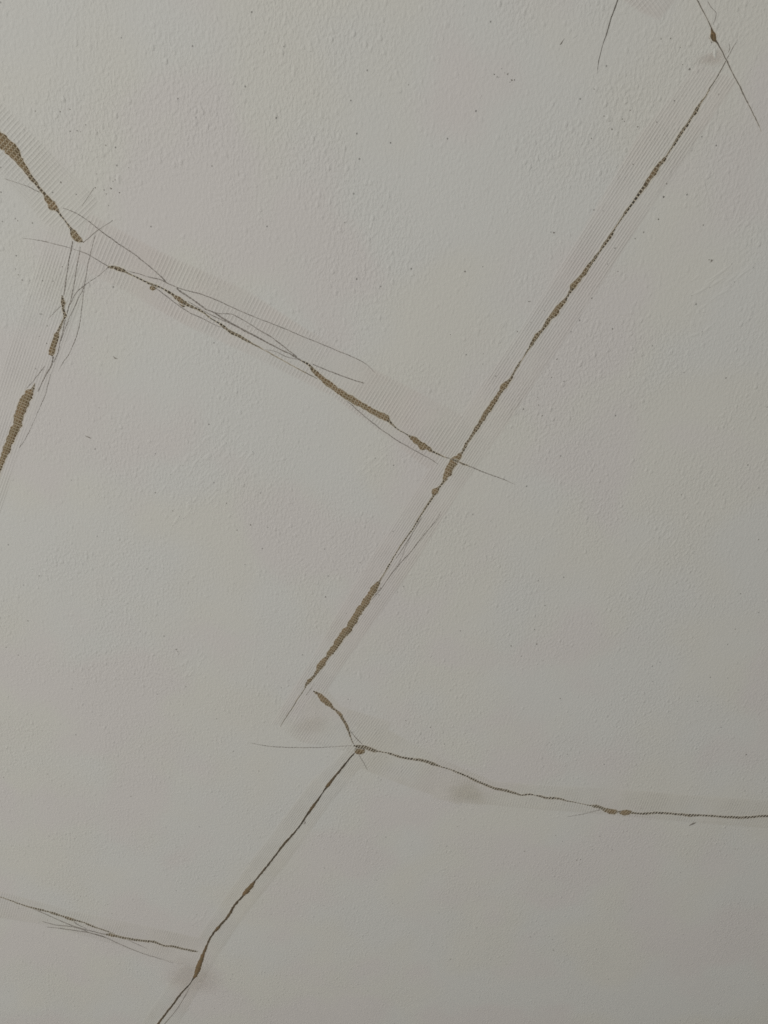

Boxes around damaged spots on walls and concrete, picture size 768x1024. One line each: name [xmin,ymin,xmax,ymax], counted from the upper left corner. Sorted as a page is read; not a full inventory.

crack [0,0,762,727]
crack [0,896,198,963]
crack [156,686,768,1024]